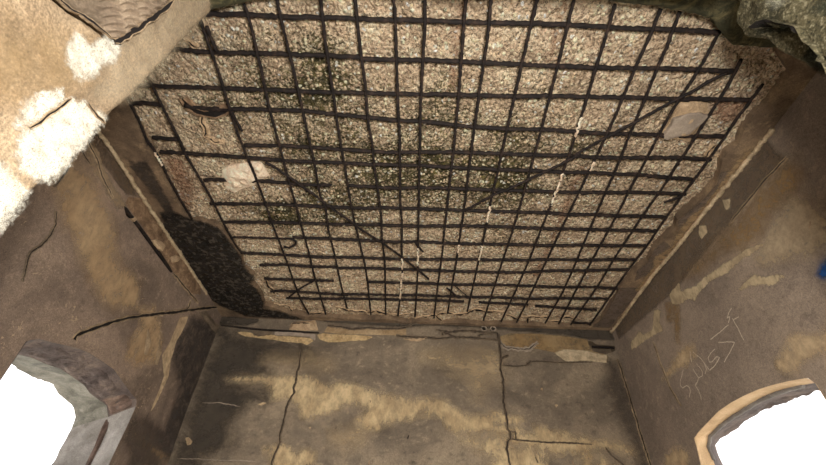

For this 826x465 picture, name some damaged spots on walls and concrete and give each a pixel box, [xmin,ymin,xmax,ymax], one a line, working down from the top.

crack [28,97,106,130]
spalling [124,0,786,323]
crack [21,211,58,282]
leakage [755,195,826,264]
crack [72,273,218,341]
spalling [221,325,426,345]
crack [265,280,624,465]
spalling [588,341,615,354]
peeling [631,244,763,349]
crack [616,359,652,465]